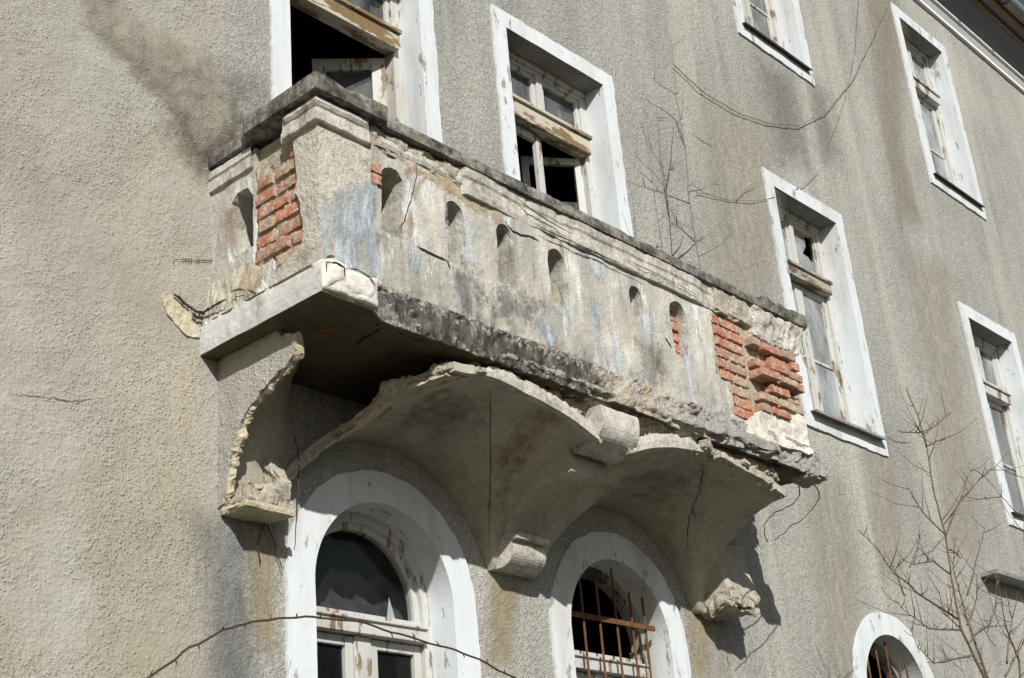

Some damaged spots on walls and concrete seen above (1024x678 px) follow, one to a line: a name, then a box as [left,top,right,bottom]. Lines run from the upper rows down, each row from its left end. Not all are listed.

spalling [236,146,303,296]
crack [397,163,451,269]
spalling [161,292,205,338]
spalling [217,331,305,506]
crack [485,391,493,530]
peeling [668,312,693,398]
crack [687,465,703,552]
spalling [711,313,805,421]